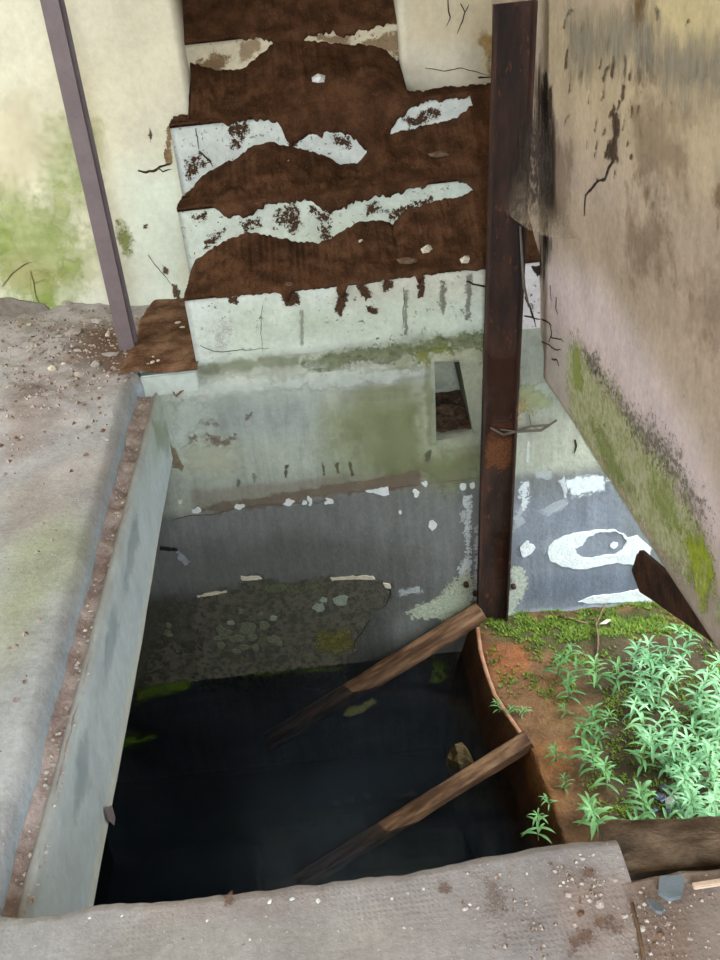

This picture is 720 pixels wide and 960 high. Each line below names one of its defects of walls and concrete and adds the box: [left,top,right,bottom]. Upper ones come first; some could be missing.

crack [446,0,469,34]
peeling [402,105,442,130]
crack [138,163,172,174]
damp [534,65,554,285]
crack [584,110,620,216]
peeling [239,203,335,241]
crack [524,297,563,366]
rust [484,421,513,473]
damp [559,474,610,498]
spalling [510,328,664,615]
damp [579,342,716,537]
spalling [115,336,483,789]